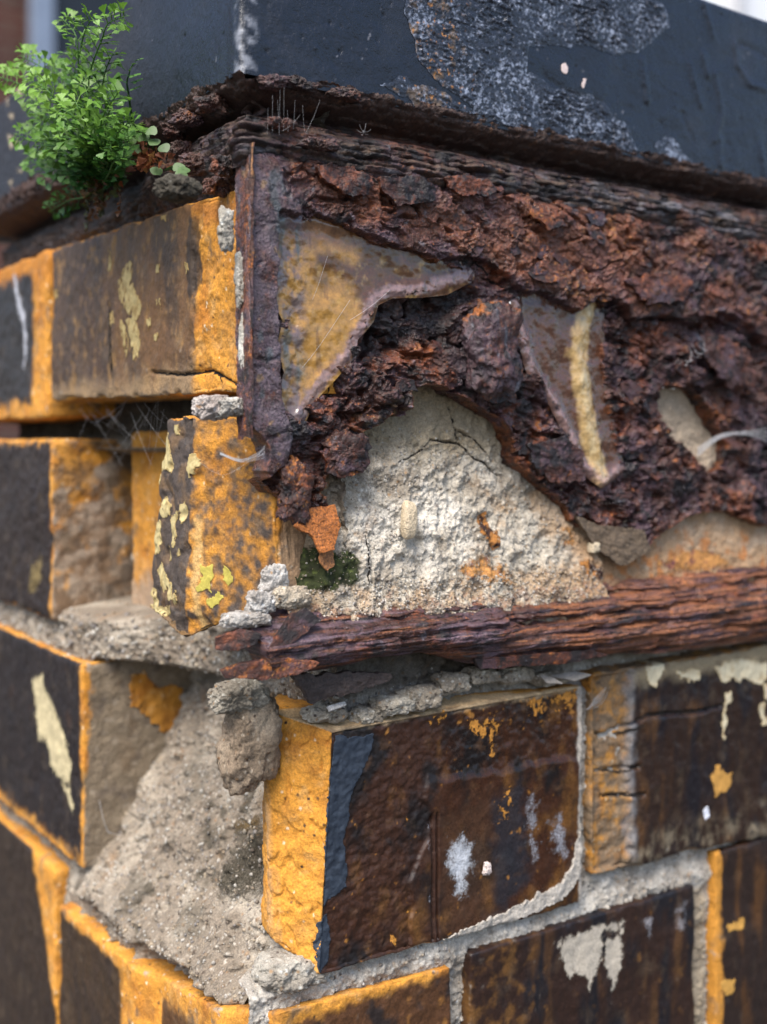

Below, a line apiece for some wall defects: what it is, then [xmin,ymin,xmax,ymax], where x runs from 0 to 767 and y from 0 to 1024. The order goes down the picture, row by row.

spalling [380,0,669,155]
spalling [655,137,692,163]
rust [315,162,504,207]
peeling [107,247,158,361]
rust [598,272,693,306]
rust [694,335,757,389]
crack [400,409,496,475]
rust [513,435,586,484]
rust [293,504,341,571]
spalling [129,670,184,733]
spalling [530,671,591,716]
spalling [467,718,504,757]